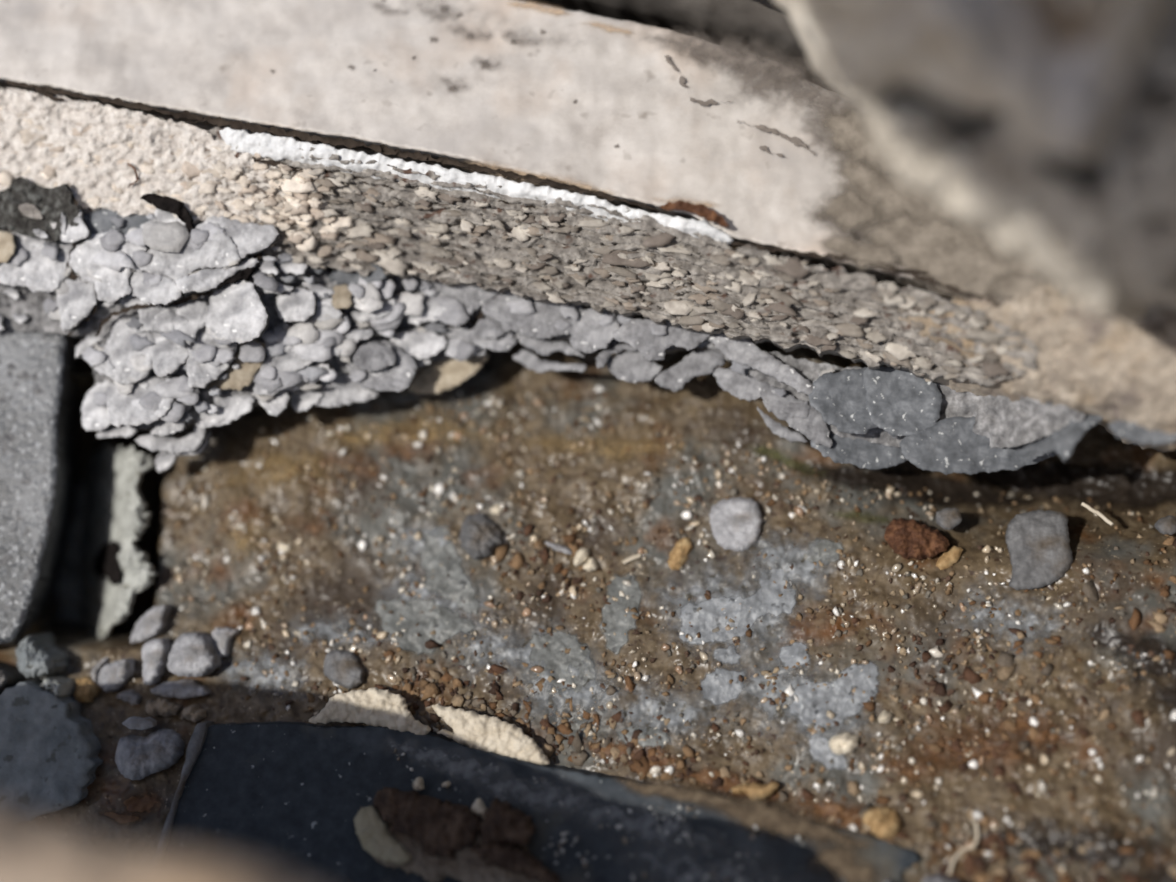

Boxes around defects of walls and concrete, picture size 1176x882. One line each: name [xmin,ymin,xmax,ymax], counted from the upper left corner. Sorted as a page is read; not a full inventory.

peeling [0,86,1176,654]
corrosion [589,743,751,800]
corrosion [887,716,1069,782]
corrosion [765,790,864,829]